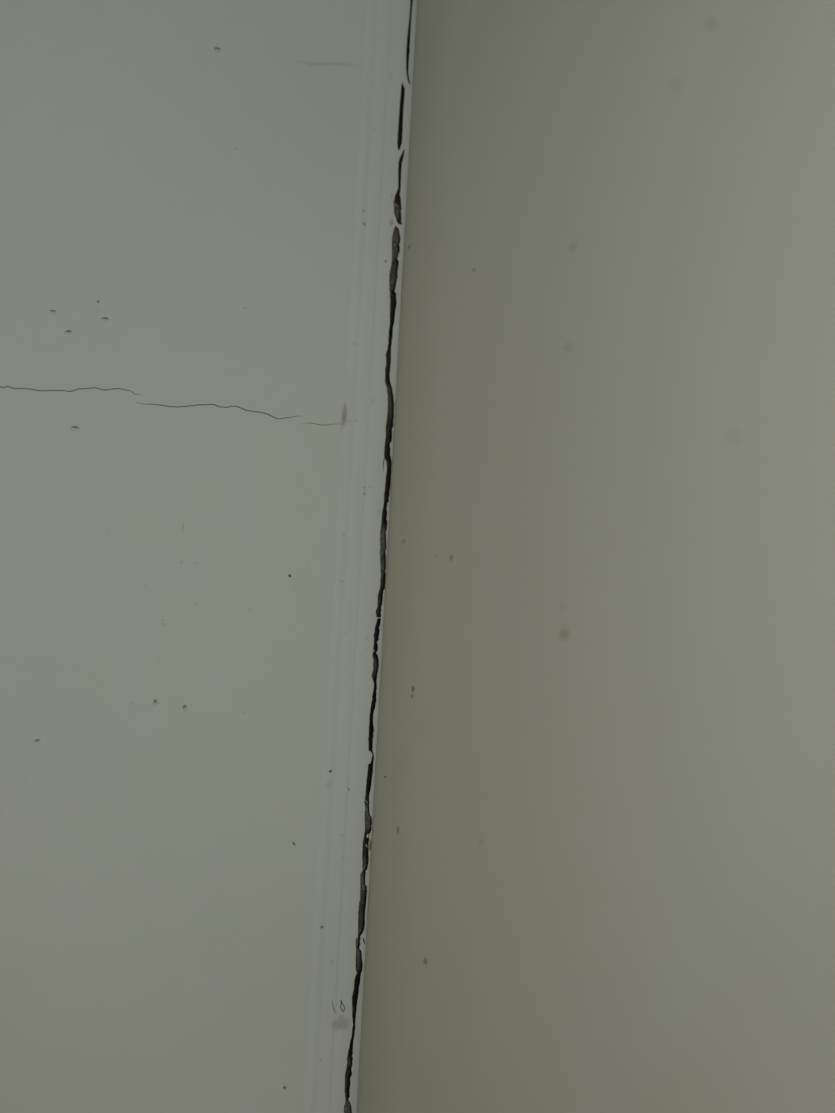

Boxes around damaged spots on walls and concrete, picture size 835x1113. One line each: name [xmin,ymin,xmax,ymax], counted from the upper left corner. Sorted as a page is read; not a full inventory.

crack [0,386,332,426]
crack [344,0,413,1113]